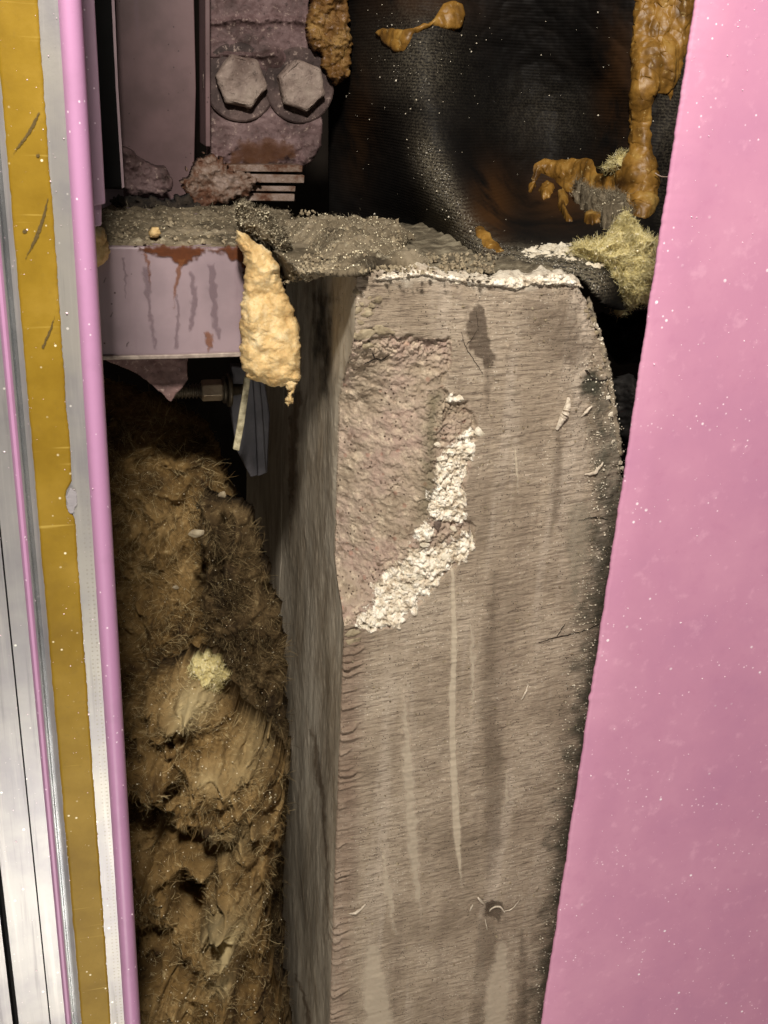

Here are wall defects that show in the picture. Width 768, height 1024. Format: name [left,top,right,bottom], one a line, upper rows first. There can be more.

corrosion [179,137,295,207]
corrosion [139,244,246,291]
spalling [374,270,582,290]
leakage [467,305,495,367]
spalling [335,288,485,645]
leakage [449,568,461,874]
leakage [402,709,420,899]
leakage [364,946,392,1024]
leakage [485,946,509,1024]